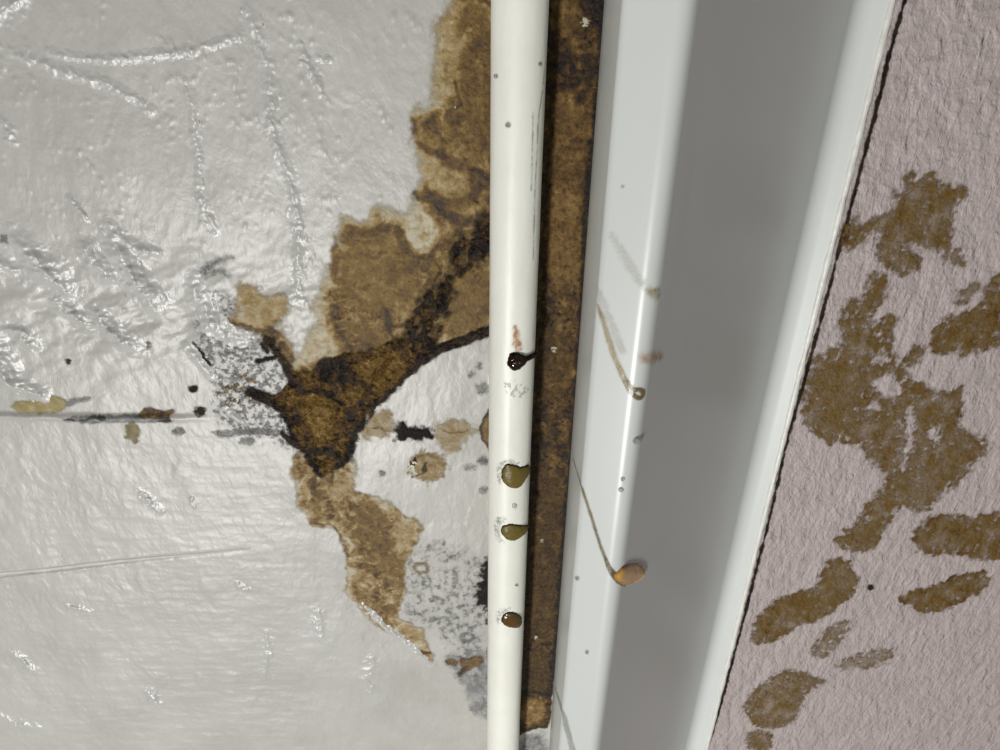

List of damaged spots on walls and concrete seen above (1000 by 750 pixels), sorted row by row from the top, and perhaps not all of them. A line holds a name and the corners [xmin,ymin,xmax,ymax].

water stain [194,0,491,717]
crack [710,0,907,742]
water stain [750,171,1000,659]
water stain [743,670,825,750]
water stain [840,649,893,670]